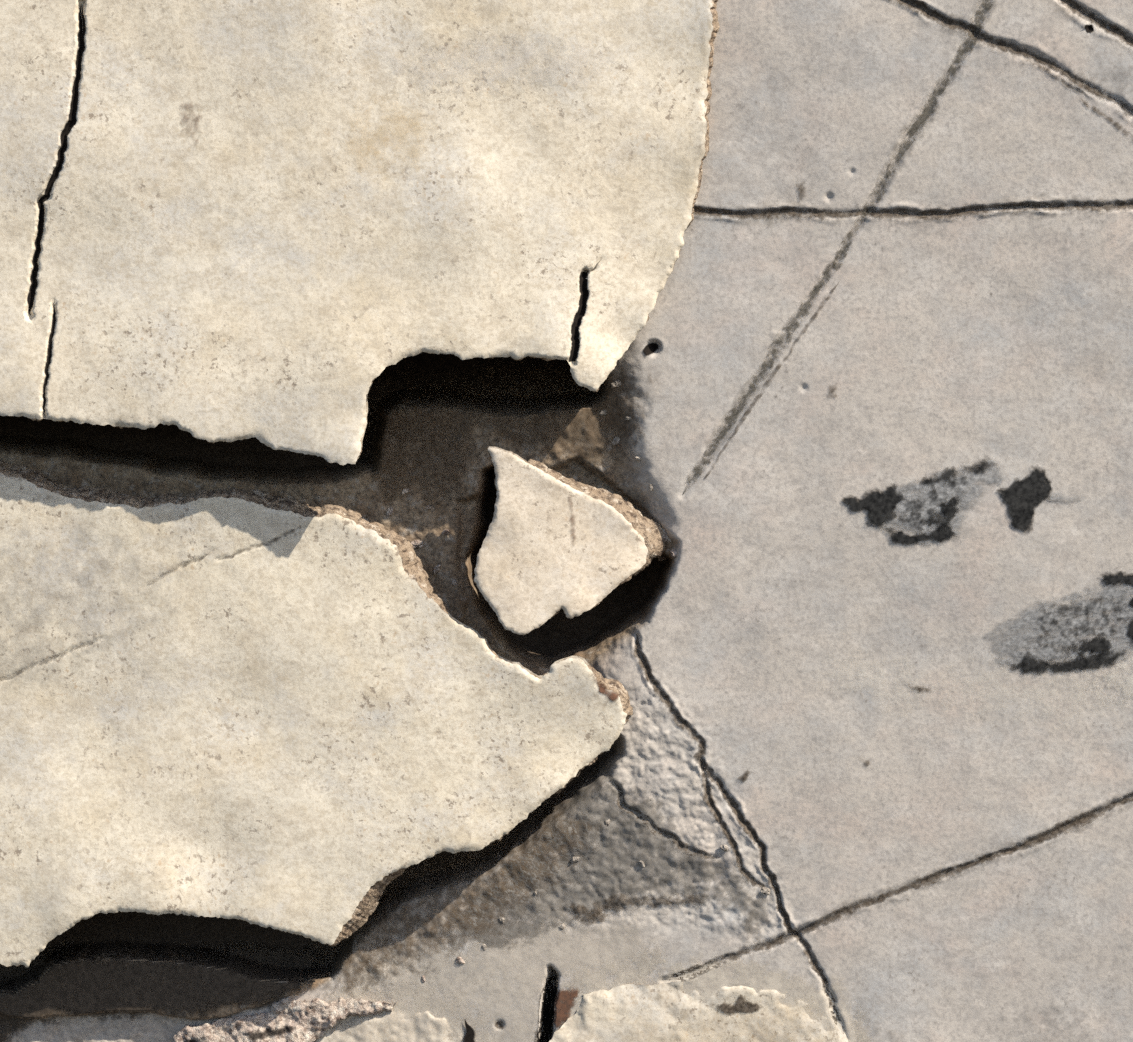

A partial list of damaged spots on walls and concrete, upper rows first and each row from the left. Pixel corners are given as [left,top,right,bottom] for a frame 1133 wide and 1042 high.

spalling [689,0,720,225]
crack [27,5,86,415]
crack [569,261,600,362]
spalling [643,343,658,355]
spalling [0,460,449,614]
damp [842,460,1075,545]
damp [990,571,1133,692]
spalling [584,662,633,722]
crack [615,634,840,1024]
spalling [325,865,411,946]
spalling [173,996,397,1042]
spalling [717,995,760,1014]